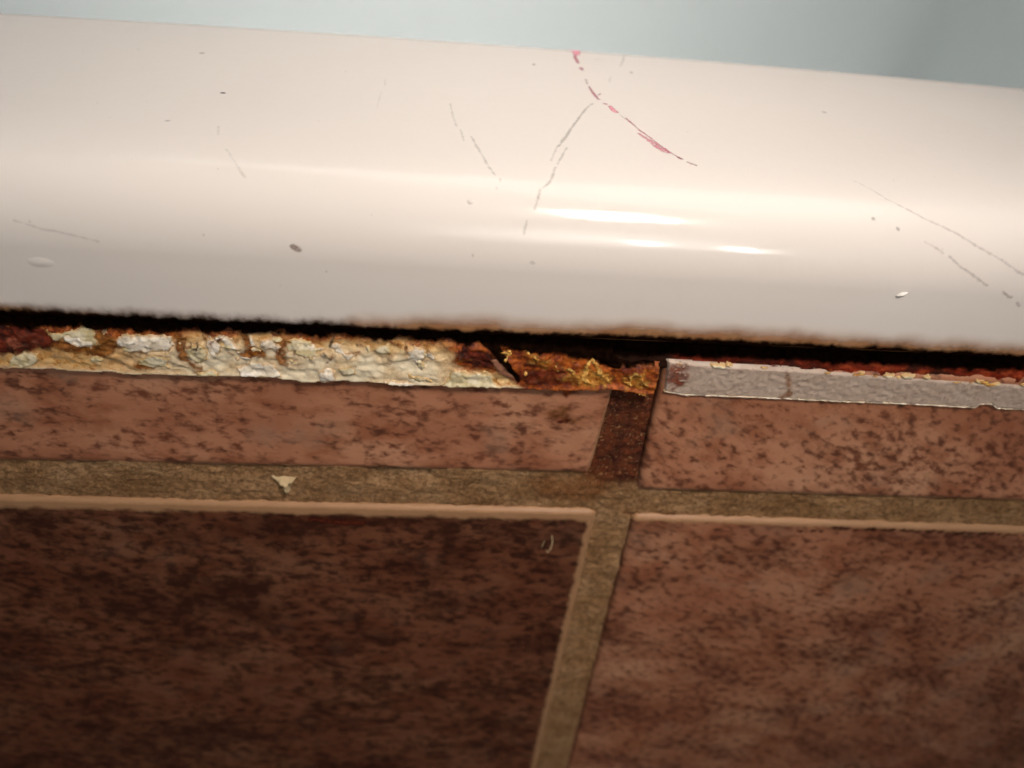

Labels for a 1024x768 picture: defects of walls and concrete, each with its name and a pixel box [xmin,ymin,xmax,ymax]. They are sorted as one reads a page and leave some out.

corrosion [0,325,118,357]
leakage [0,307,1024,372]
corrosion [370,322,1024,483]